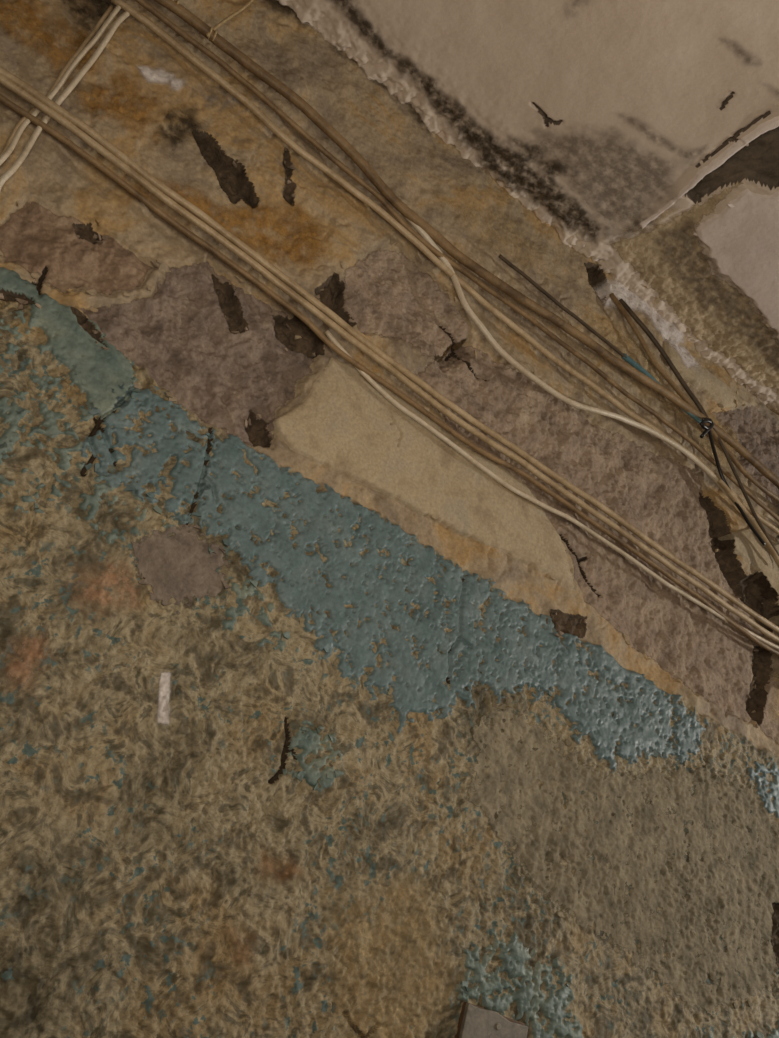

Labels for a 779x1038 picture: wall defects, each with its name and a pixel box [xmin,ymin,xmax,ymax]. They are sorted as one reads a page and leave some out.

spalling [192,131,260,209]
spalling [282,147,297,206]
crack [439,326,487,381]
crack [80,409,117,476]
crack [204,427,213,466]
crack [186,492,199,525]
peeling [0,201,779,1021]
crack [268,717,297,784]
peeling [448,930,584,1038]